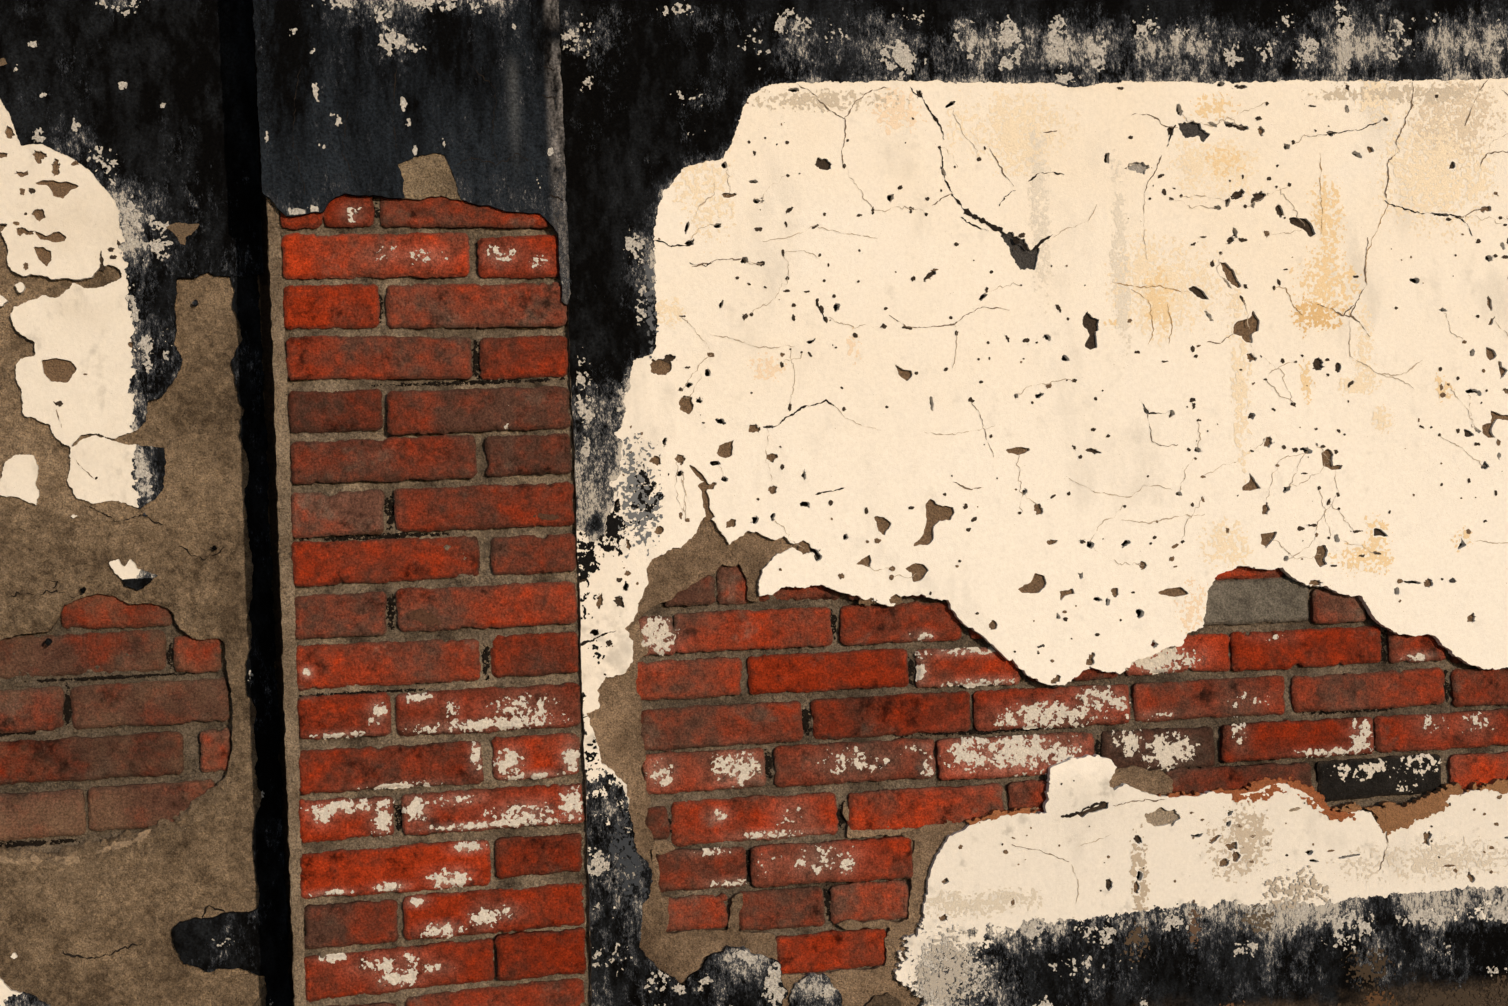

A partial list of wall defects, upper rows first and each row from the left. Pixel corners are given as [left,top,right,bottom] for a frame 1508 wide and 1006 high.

peeling [42,358,87,383]
spalling [0,127,199,271]
crack [655,84,1097,559]
crack [1069,404,1374,566]
crack [1113,81,1508,403]
crack [1443,388,1508,466]
spalling [267,138,1508,1006]
spalling [0,594,233,865]
efflorescence [300,692,583,853]
leakage [1294,718,1442,793]
efflorescence [319,953,441,987]
efflorescence [420,905,513,939]